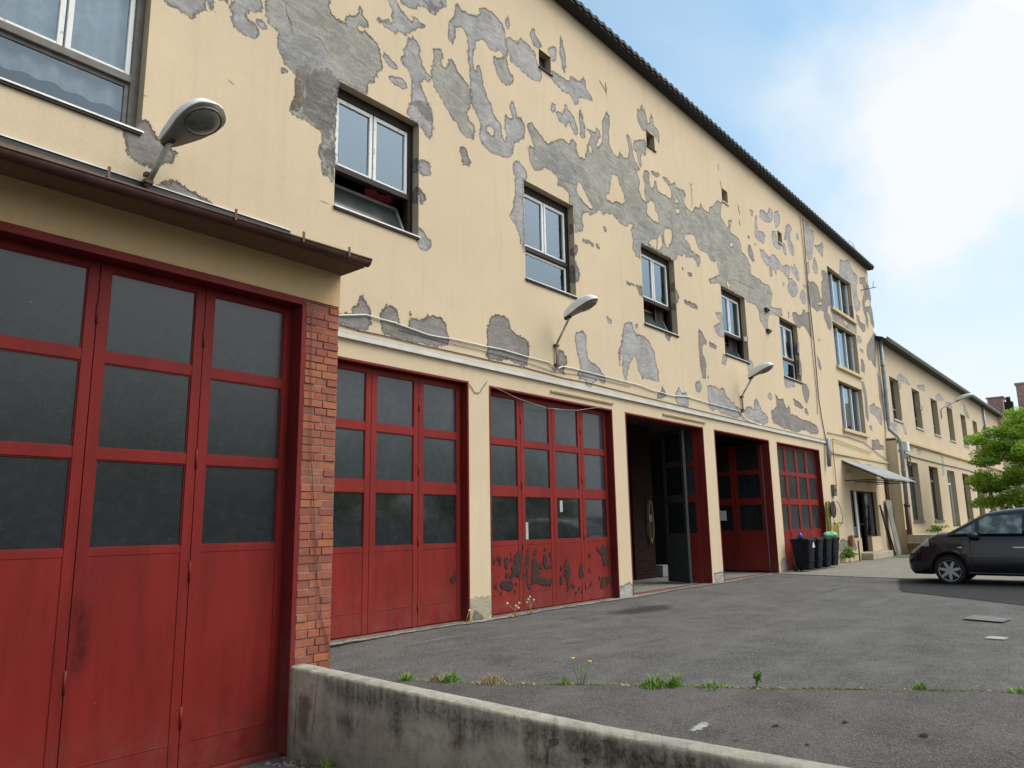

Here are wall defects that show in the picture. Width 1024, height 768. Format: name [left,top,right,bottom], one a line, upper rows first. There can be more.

flaking render [123,118,178,168]
flaking render [155,179,213,204]
flaking render [164,0,922,455]
peeling [492,544,613,595]